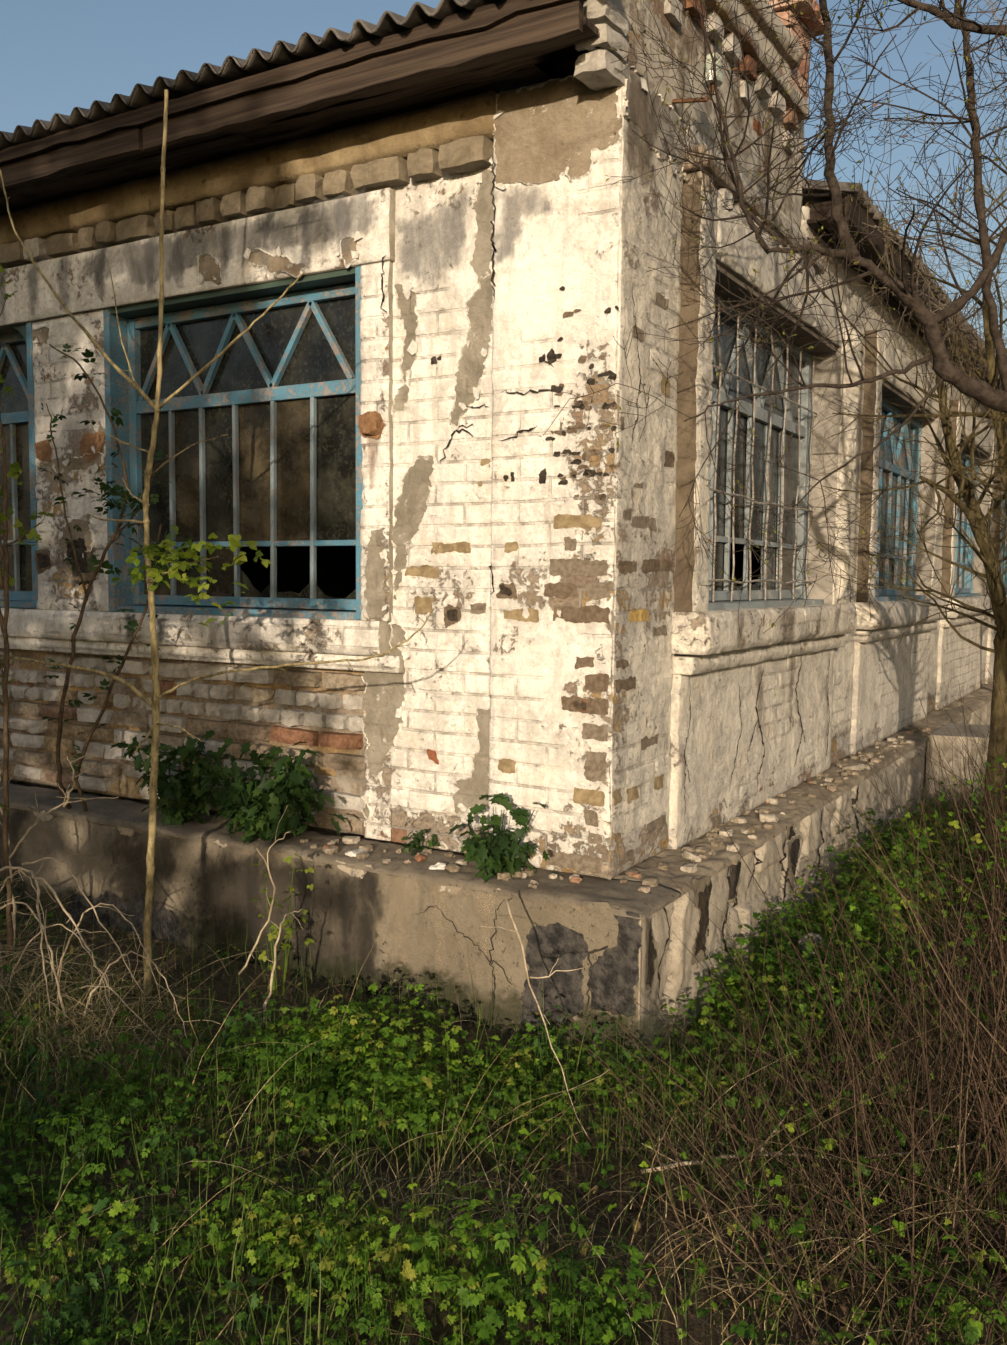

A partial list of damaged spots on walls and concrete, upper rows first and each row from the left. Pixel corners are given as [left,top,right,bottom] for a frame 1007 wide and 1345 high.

crack [440,359,562,461]
spalling [499,383,673,624]
peeling [361,455,471,827]
spalling [414,596,486,621]
peeling [448,706,516,816]
spalling [545,657,667,874]
crack [683,686,691,819]
crack [729,652,831,790]
leakage [181,855,686,1078]
crack [410,898,515,1005]
spalling [681,850,712,968]
spalling [727,860,741,915]